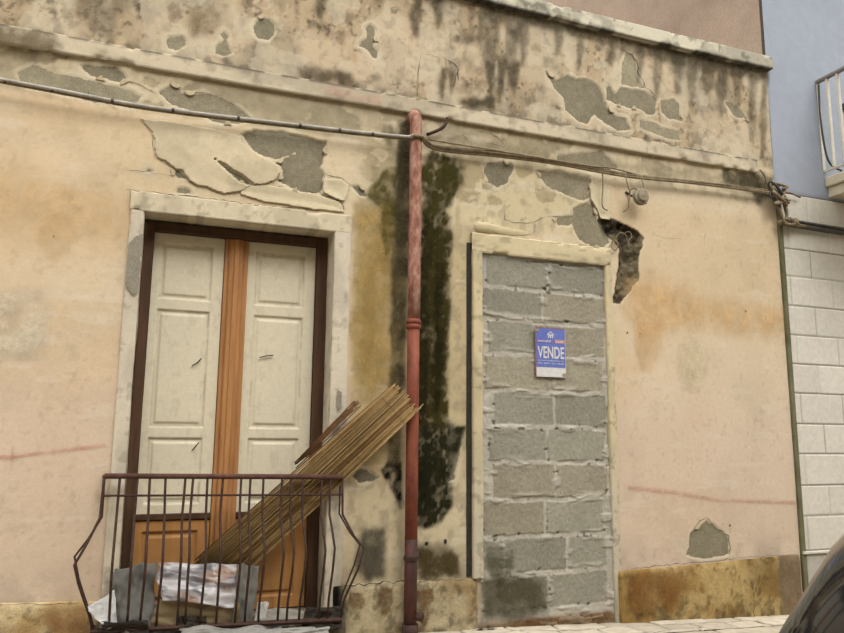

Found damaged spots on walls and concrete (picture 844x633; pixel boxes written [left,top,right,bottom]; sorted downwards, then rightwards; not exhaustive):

water stain [0,27,55,50]
peeling [18,65,141,109]
water stain [412,0,421,34]
water stain [462,4,603,108]
spalling [546,53,683,140]
water stain [620,38,768,120]
crack [130,121,351,213]
spalling [243,130,328,193]
spalling [484,160,513,187]
spalling [536,150,643,304]
water stain [425,227,450,413]
spalling [686,521,728,559]